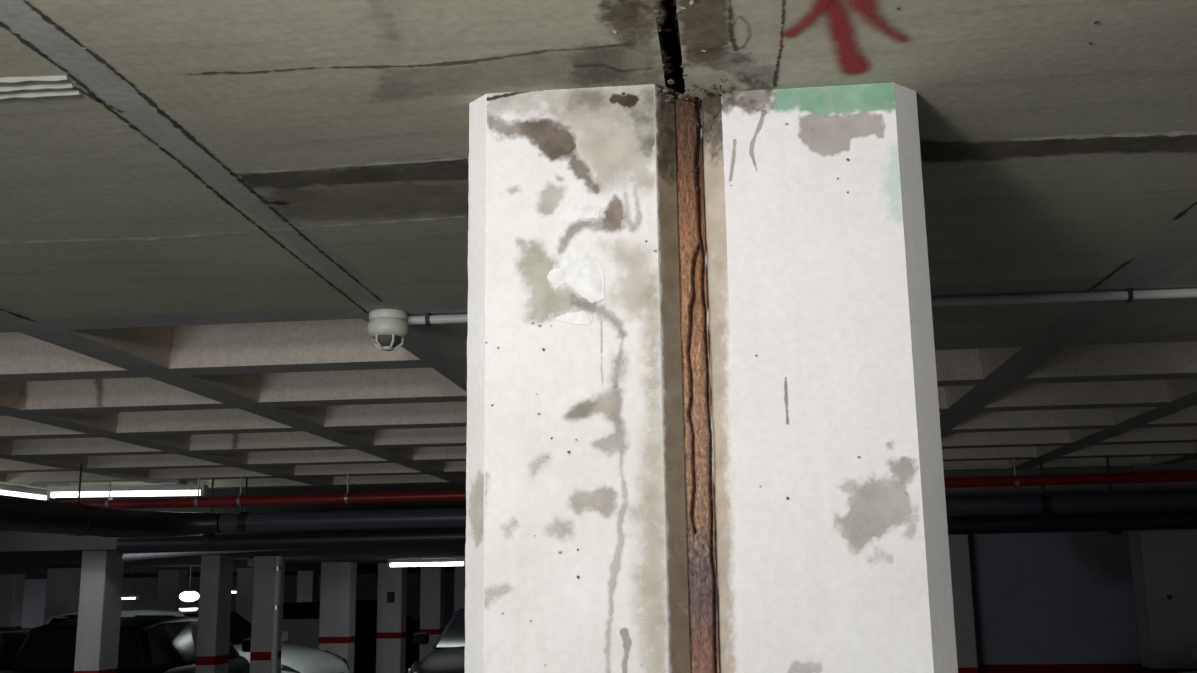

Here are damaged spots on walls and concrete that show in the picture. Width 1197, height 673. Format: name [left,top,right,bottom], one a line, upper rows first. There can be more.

crack [189,43,651,75]
damp [600,0,662,46]
damp [727,0,748,51]
crack [729,0,786,181]
damp [488,85,690,673]
crack [688,96,717,673]
damp [701,107,732,673]
damp [469,475,483,541]
damp [838,458,916,549]